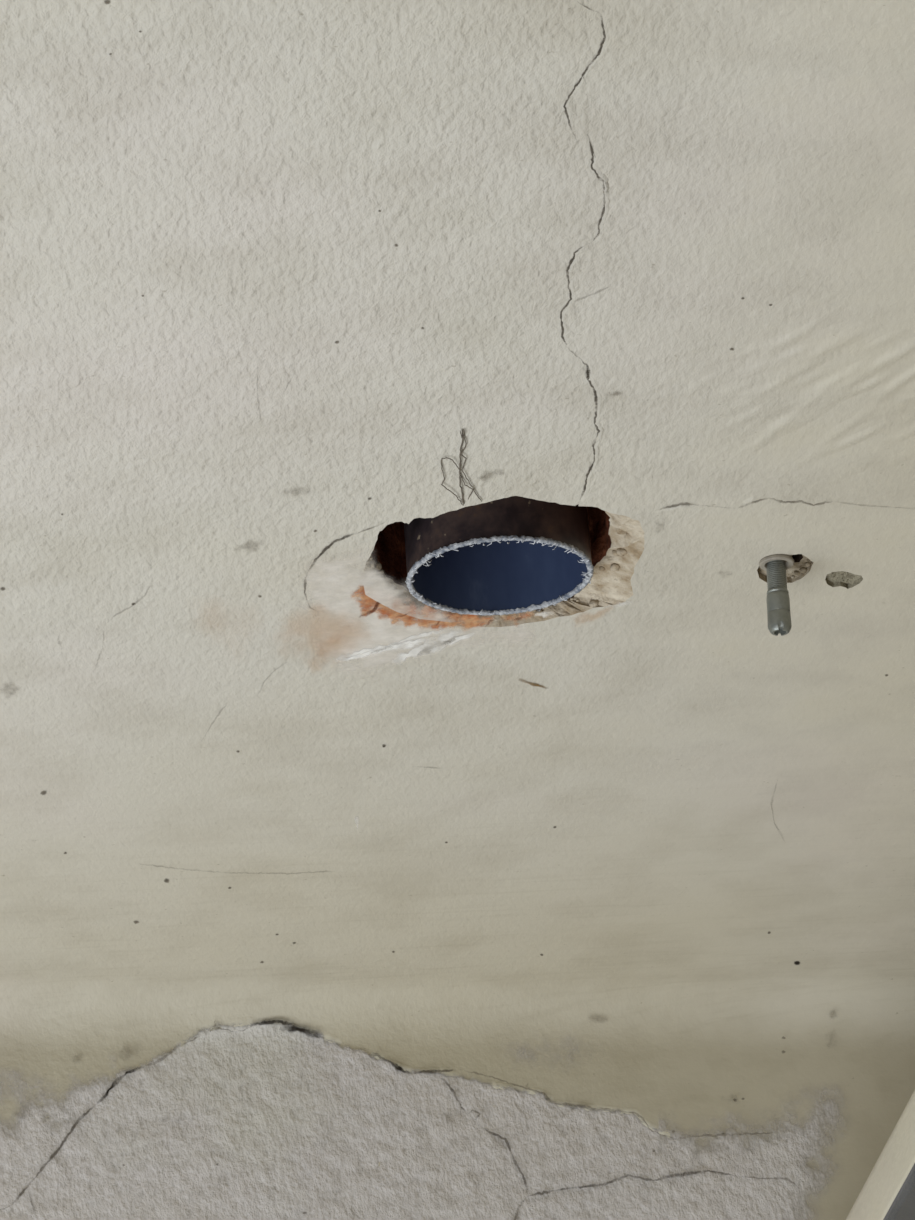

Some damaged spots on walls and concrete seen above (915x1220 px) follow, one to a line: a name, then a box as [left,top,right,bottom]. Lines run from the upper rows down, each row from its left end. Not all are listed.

crack [560,0,610,502]
crack [18,1020,321,1205]
peeling [0,1015,839,1220]
crack [375,1053,793,1220]